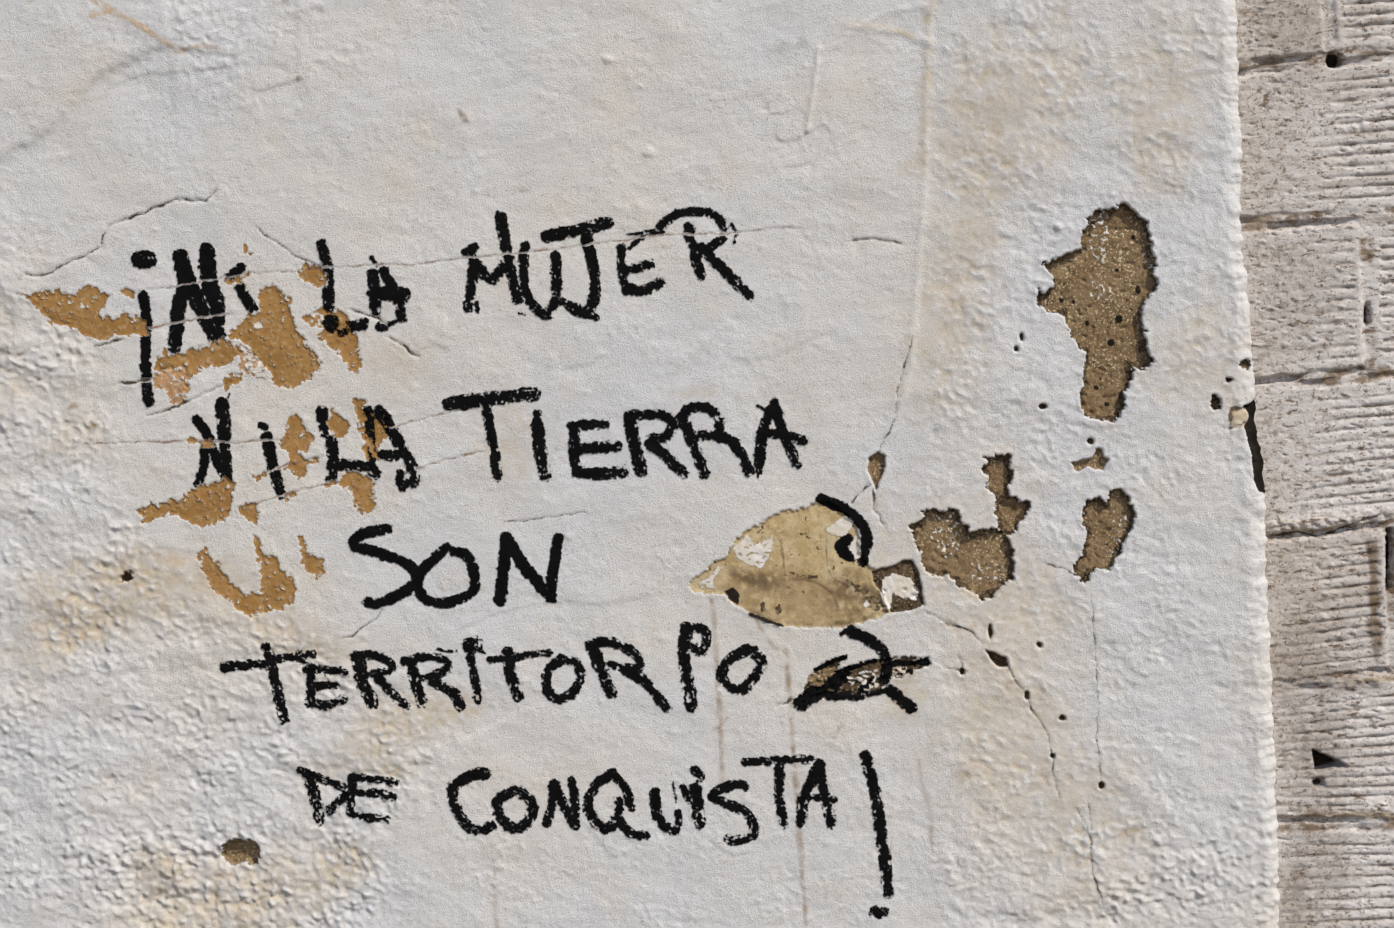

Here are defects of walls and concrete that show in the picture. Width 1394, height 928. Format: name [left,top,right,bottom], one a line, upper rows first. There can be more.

crack [21,191,215,296]
peeling [26,285,149,341]
crack [120,377,152,385]
crack [94,313,229,347]
peeling [153,286,362,405]
crack [353,310,416,356]
spalling [1037,203,1157,423]
crack [86,383,339,505]
peeling [136,476,325,618]
spalling [690,452,1030,629]
spalling [1073,489,1135,583]
crack [903,560,974,672]